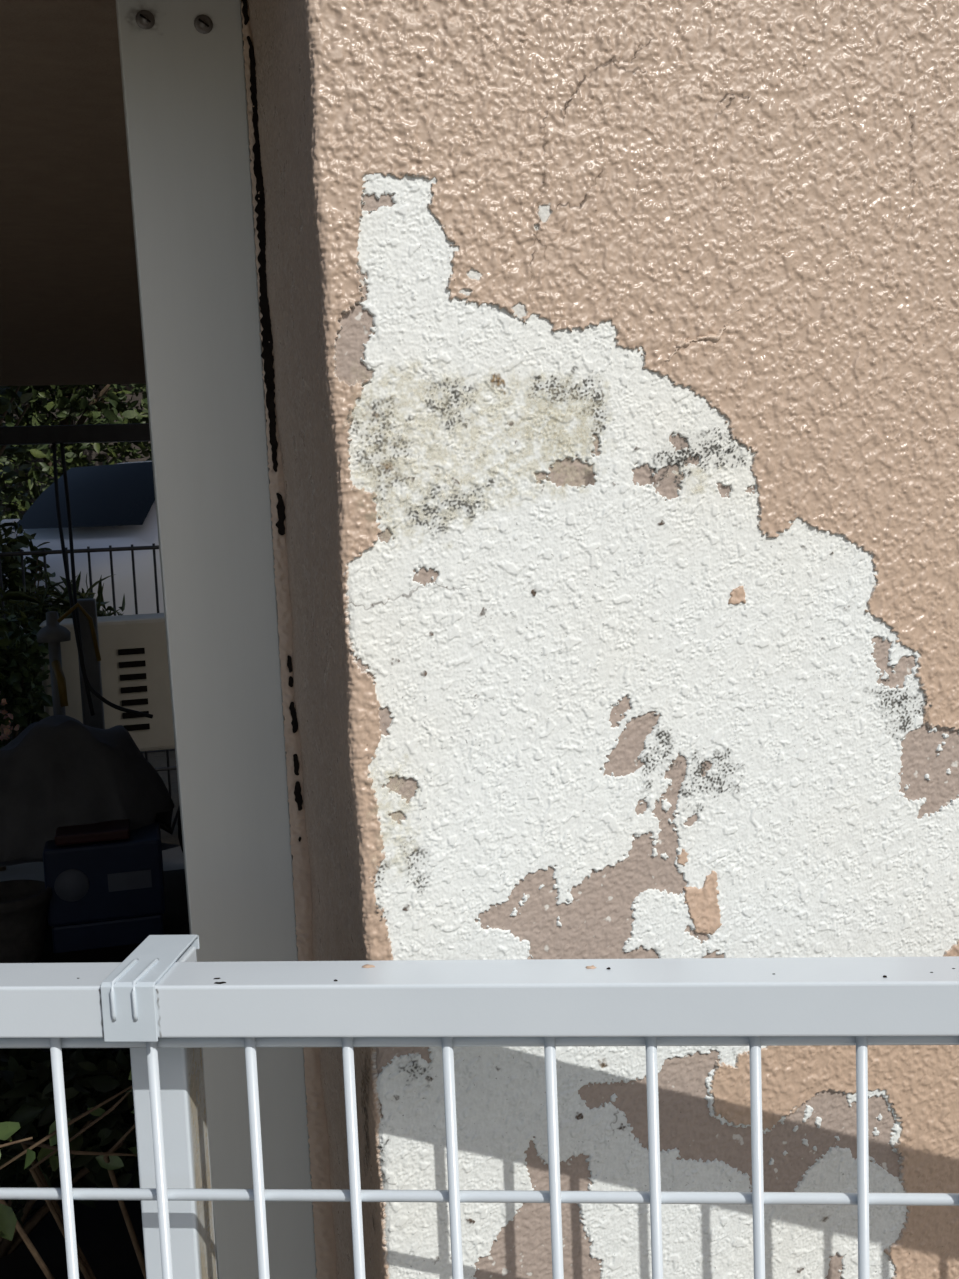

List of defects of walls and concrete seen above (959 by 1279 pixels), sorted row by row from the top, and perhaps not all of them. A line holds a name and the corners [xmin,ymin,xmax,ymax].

leakage [426,378,476,430]
leakage [528,367,606,435]
leakage [347,396,413,513]
leakage [650,428,746,486]
leakage [409,479,494,531]
peeling [335,173,959,960]
peeling [376,1046,909,1279]